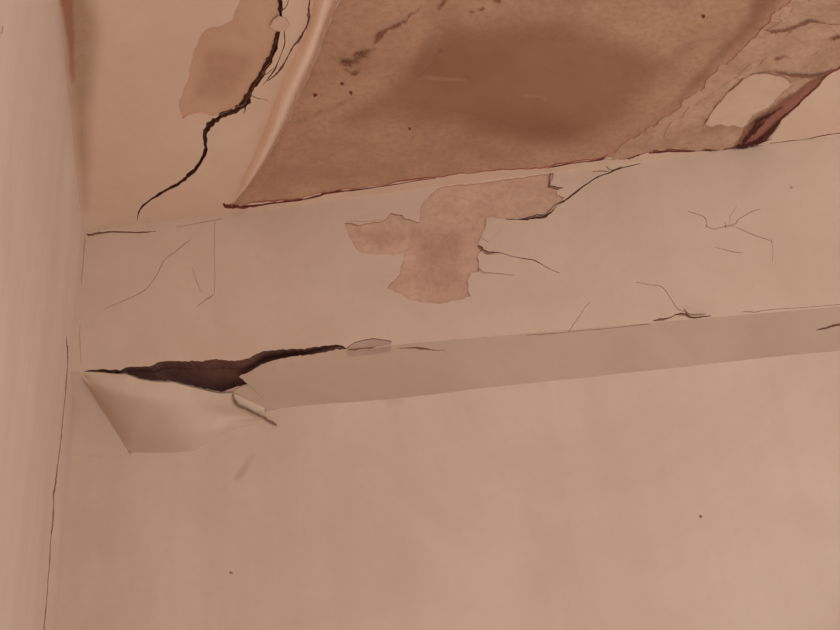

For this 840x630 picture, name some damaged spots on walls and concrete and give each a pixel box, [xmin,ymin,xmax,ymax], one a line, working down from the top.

peeling [179,0,289,119]
water stain [395,36,647,129]
crack [81,0,310,284]
flaking render [230,0,840,304]
crack [478,245,559,275]
crack [689,206,773,260]
crack [526,282,711,336]
spalling [84,338,391,425]